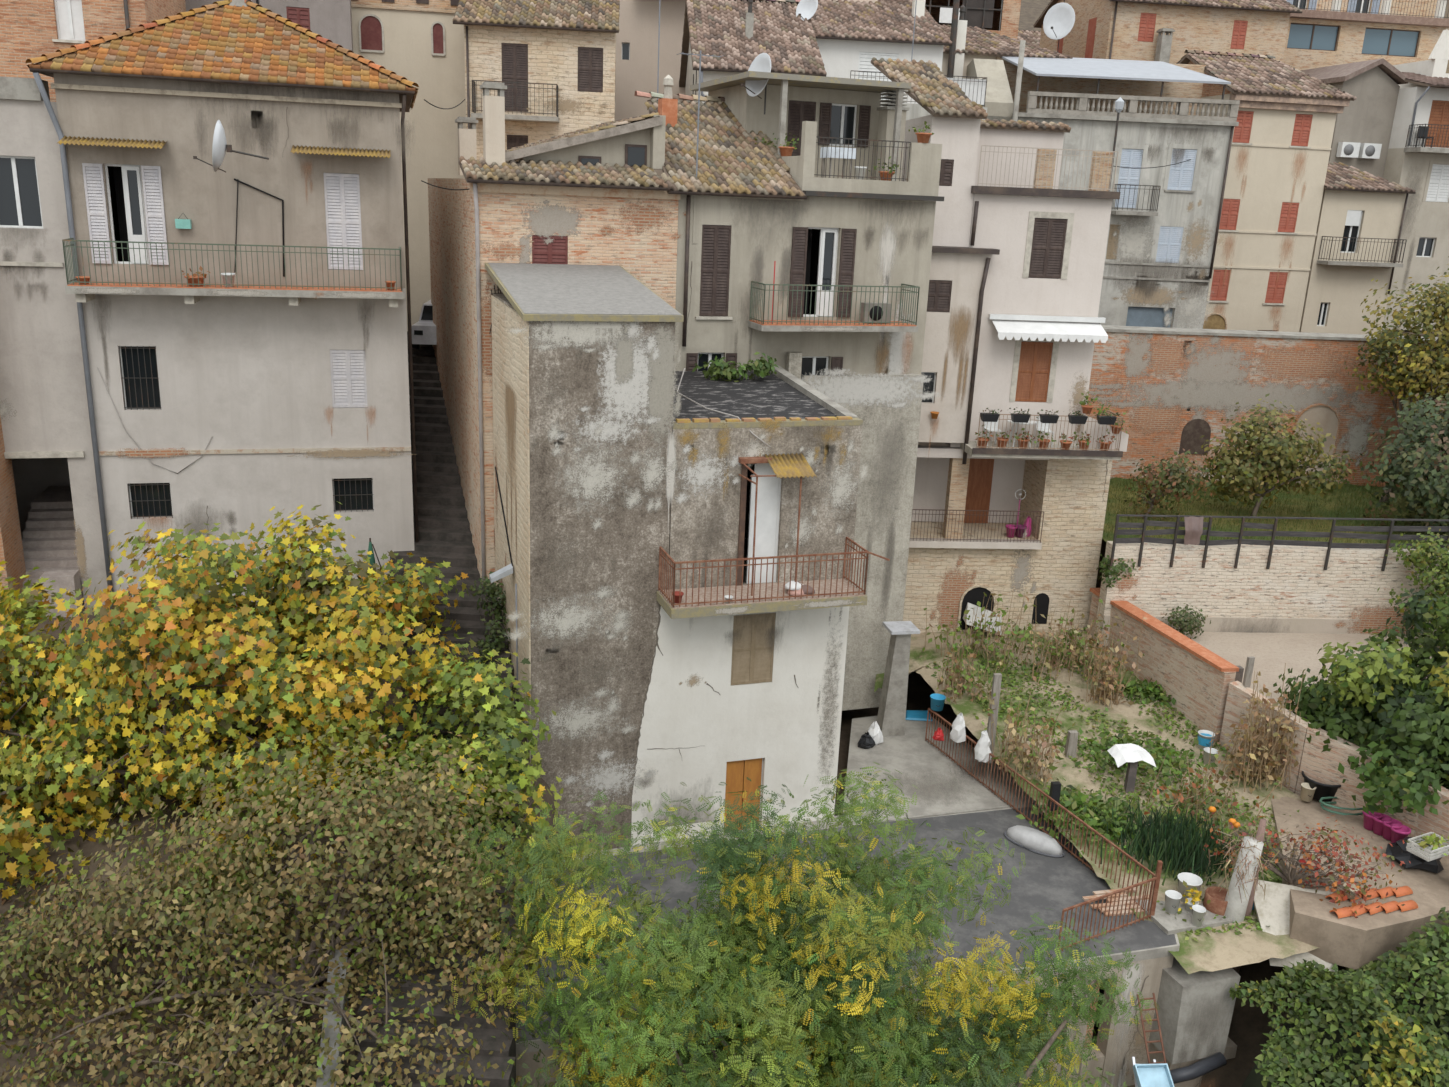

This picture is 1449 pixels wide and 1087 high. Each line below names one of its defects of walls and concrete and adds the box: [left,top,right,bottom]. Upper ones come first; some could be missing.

peeling [481,281,771,530]
damp [942,313,969,398]
peeling [1070,376,1151,408]
peeling [494,455,631,643]